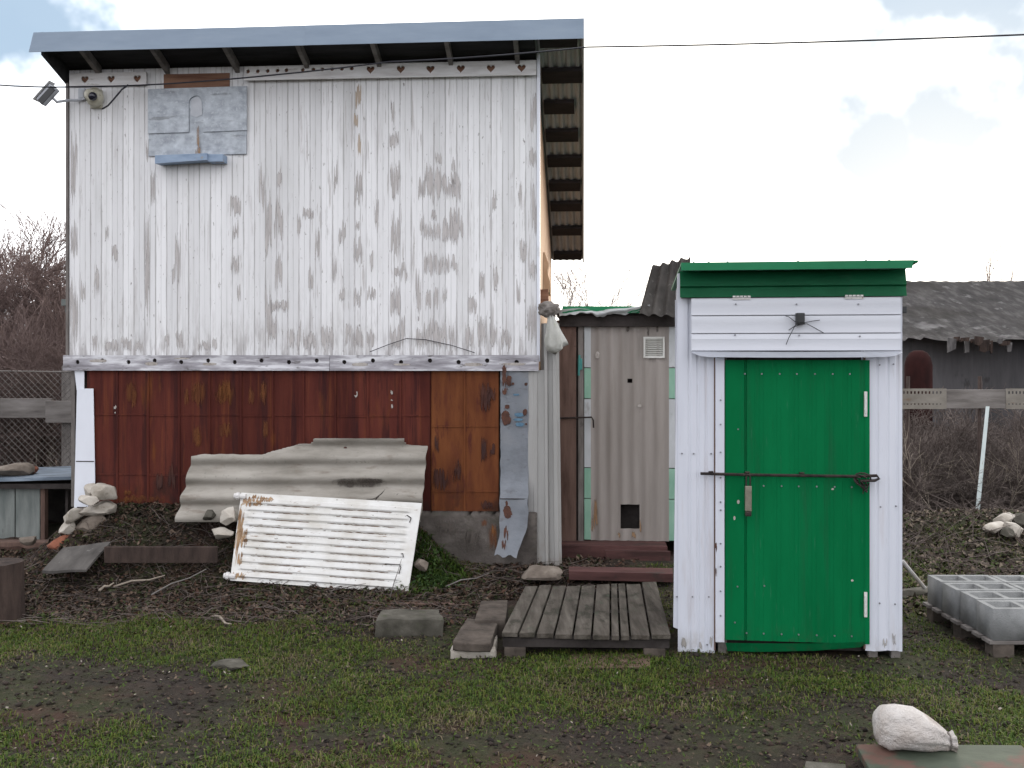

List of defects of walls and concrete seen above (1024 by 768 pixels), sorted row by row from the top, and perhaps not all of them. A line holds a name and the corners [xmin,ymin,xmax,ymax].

peeling [146,140,155,200]
peeling [70,266,99,342]
peeling [172,236,181,283]
peeling [230,196,241,239]
peeling [231,255,241,301]
peeling [259,169,376,352]
peeling [390,152,511,351]
peeling [518,185,537,281]
peeling [90,336,158,366]
peeling [164,331,217,365]
rust [501,365,528,425]
rust [482,501,512,550]